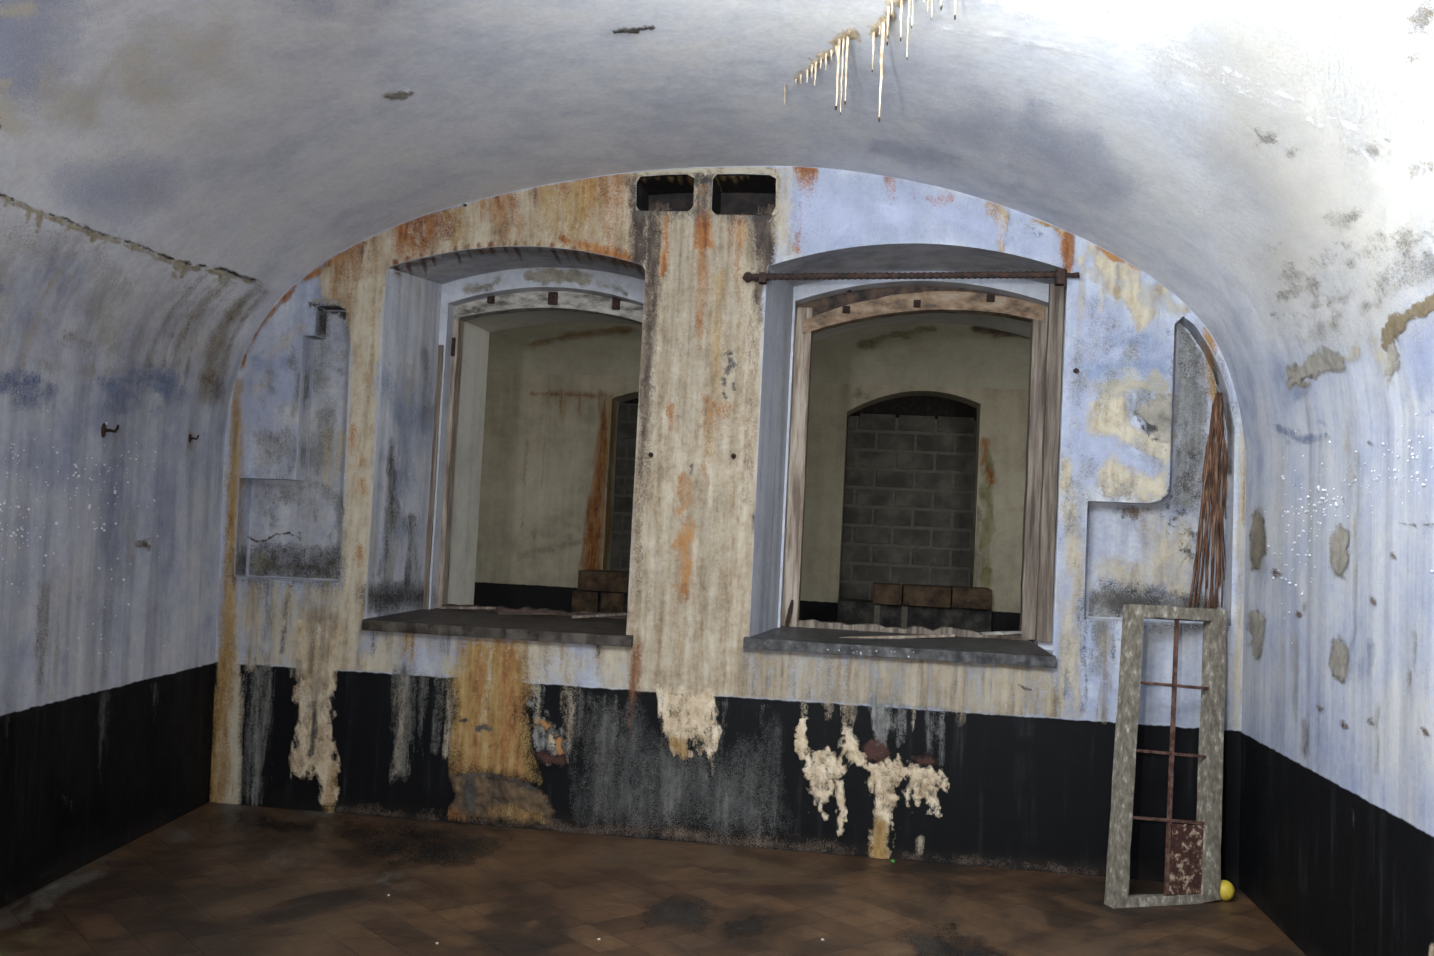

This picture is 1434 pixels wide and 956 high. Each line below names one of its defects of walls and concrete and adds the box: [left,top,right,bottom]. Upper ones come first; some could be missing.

spalling [1404,1,1434,42]
corrosion [240,167,818,370]
leakage [784,0,1139,218]
leakage [980,0,1434,416]
spalling [1246,117,1300,158]
spalling [1267,207,1434,401]
leakage [0,139,1268,894]
corrosion [667,461,711,605]
spalling [1248,504,1280,578]
corrosion [446,636,542,785]
spalling [1328,632,1350,684]